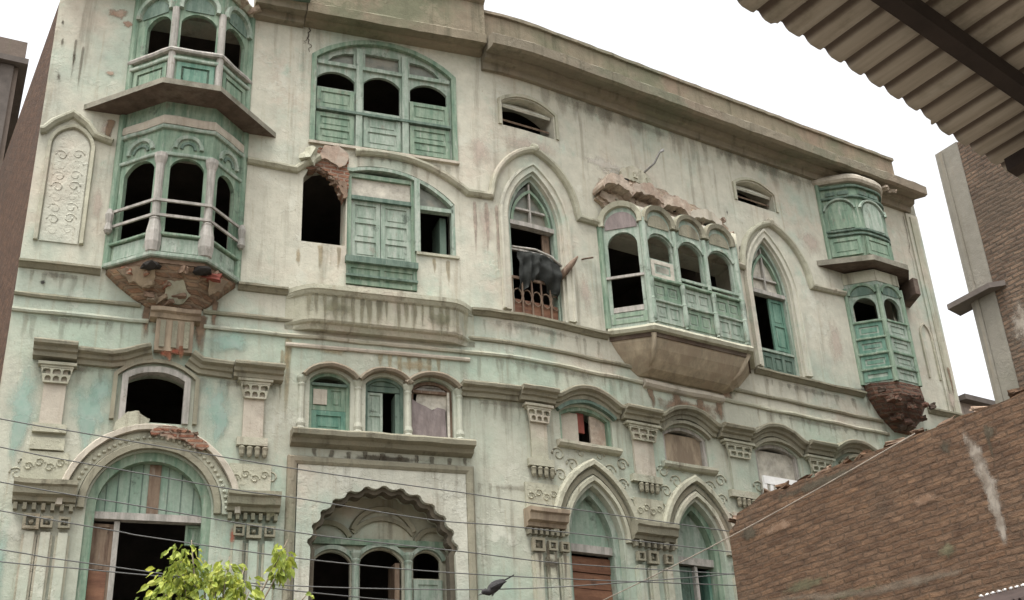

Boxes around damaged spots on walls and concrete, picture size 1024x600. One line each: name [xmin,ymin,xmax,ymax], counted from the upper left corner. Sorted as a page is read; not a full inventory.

peeling [299,146,343,200]
spalling [592,165,735,234]
water stain [307,293,468,332]
spalling [150,426,209,452]
water stain [965,425,1006,541]